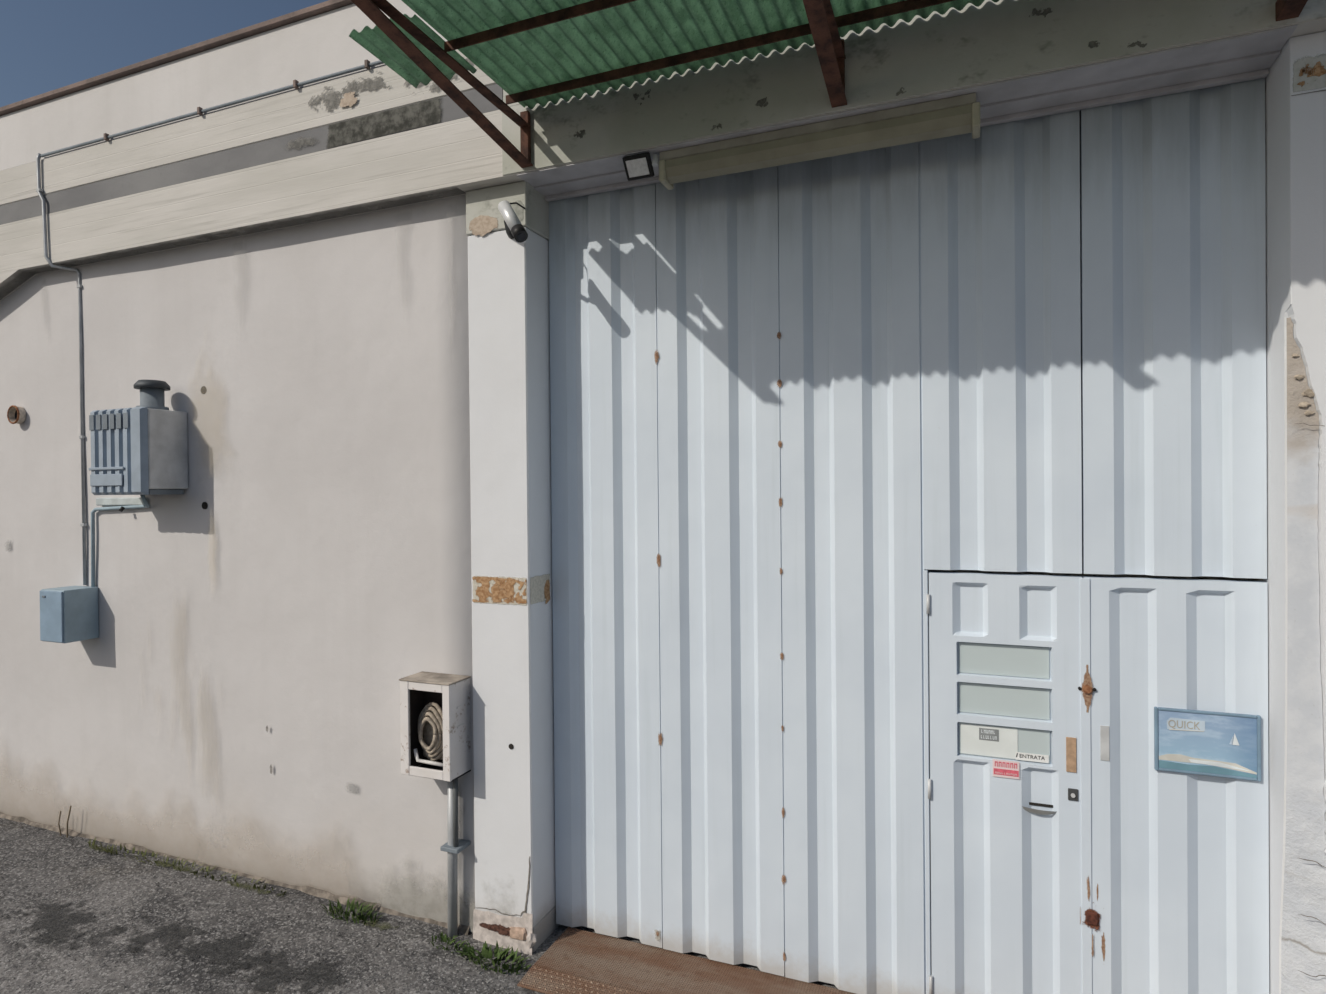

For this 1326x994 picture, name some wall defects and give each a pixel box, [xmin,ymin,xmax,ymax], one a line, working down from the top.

rust [1080,876,1105,961]
spalling [1281,317,1326,994]